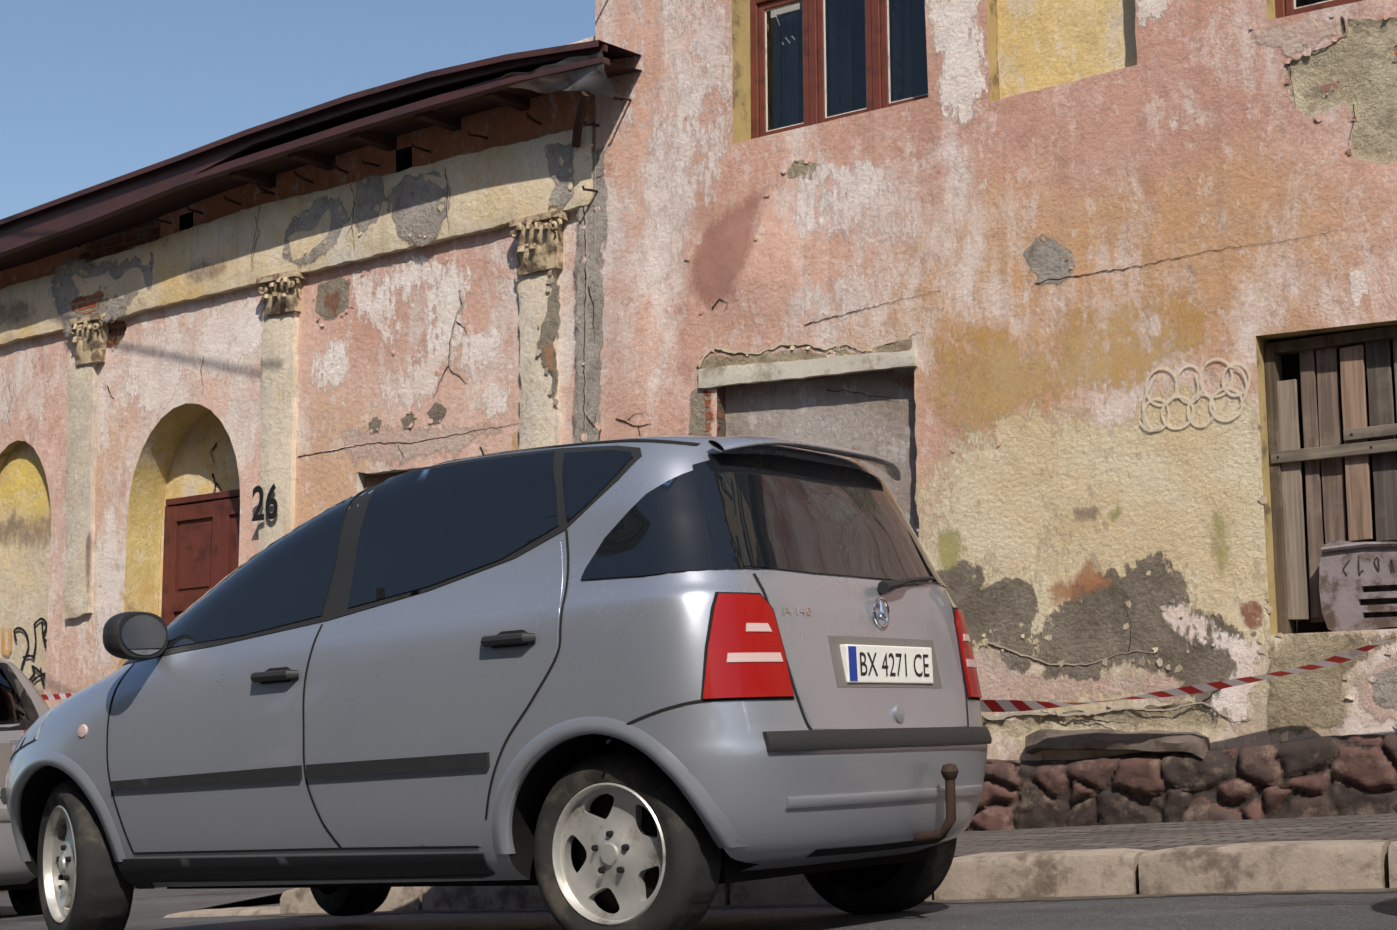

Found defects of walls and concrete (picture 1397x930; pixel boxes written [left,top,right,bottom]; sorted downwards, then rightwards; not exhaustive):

flaking render [1249,13,1397,164]
peeling [51,218,184,415]
peeling [196,292,264,382]
peeling [282,171,512,467]
peeling [535,0,732,443]
flaking render [701,337,912,369]
peeling [1023,234,1075,285]
peeling [916,379,1397,742]